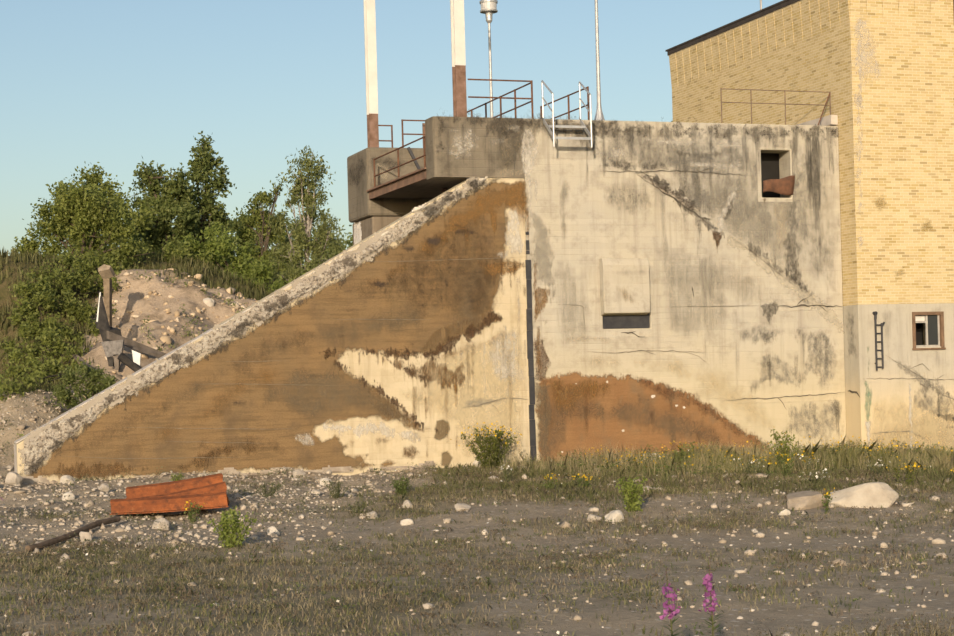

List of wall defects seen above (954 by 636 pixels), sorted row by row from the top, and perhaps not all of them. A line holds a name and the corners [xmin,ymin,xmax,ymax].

spalling [20,177,496,475]
leakage [29,181,537,479]
crack [600,168,844,327]
crack [727,355,954,407]